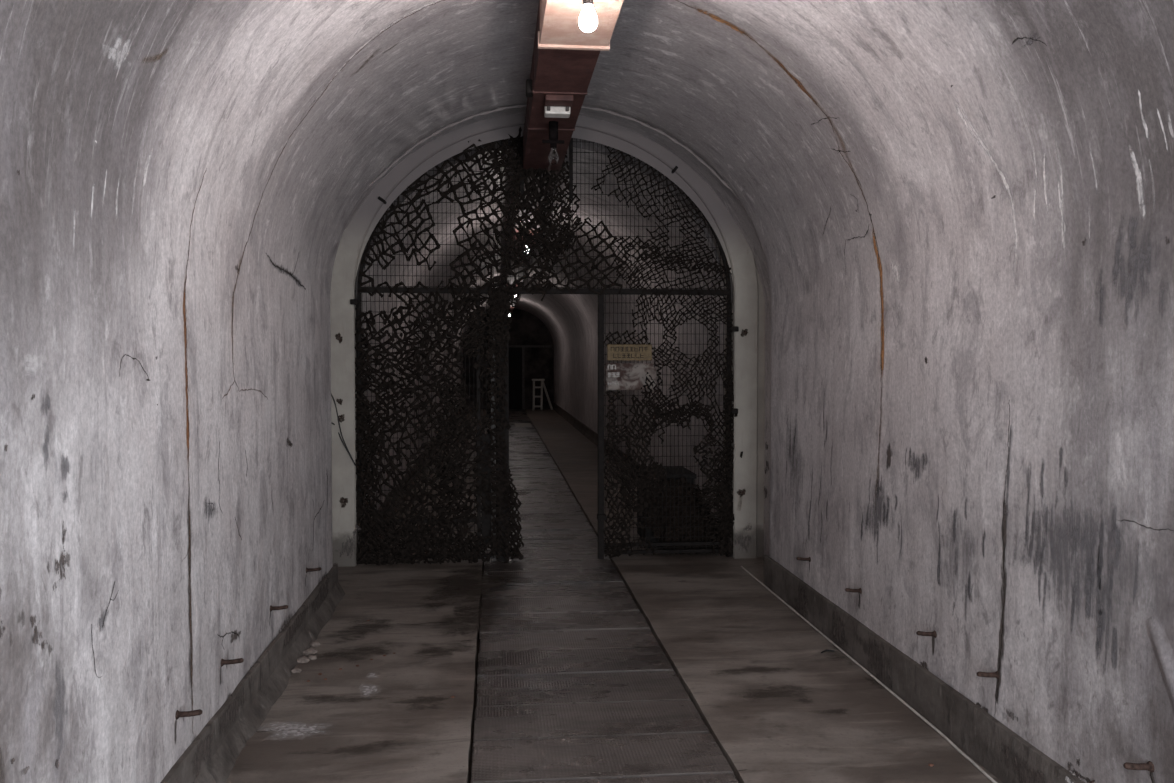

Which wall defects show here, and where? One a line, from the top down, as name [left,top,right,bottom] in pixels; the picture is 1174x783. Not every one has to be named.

rust [676,0,837,131]
crack [222,0,445,399]
rust [833,146,899,374]
damp [1015,462,1121,669]